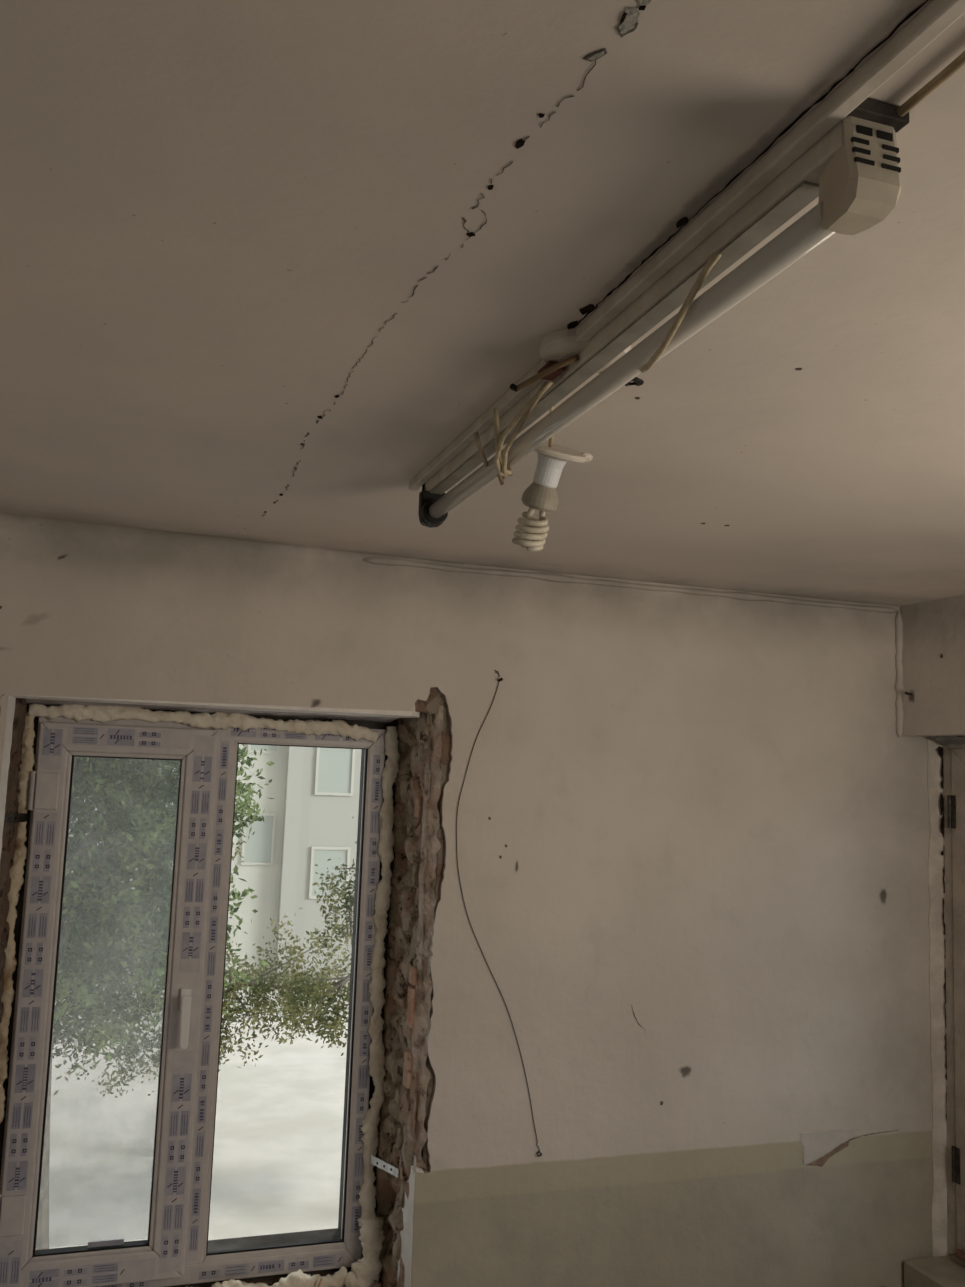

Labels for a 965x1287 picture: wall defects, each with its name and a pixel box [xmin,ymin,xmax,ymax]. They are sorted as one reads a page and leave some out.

spalling [617,0,651,38]
spalling [583,48,607,62]
crack [238,60,596,533]
spalling [0,687,451,1287]
peeling [800,1128,899,1167]